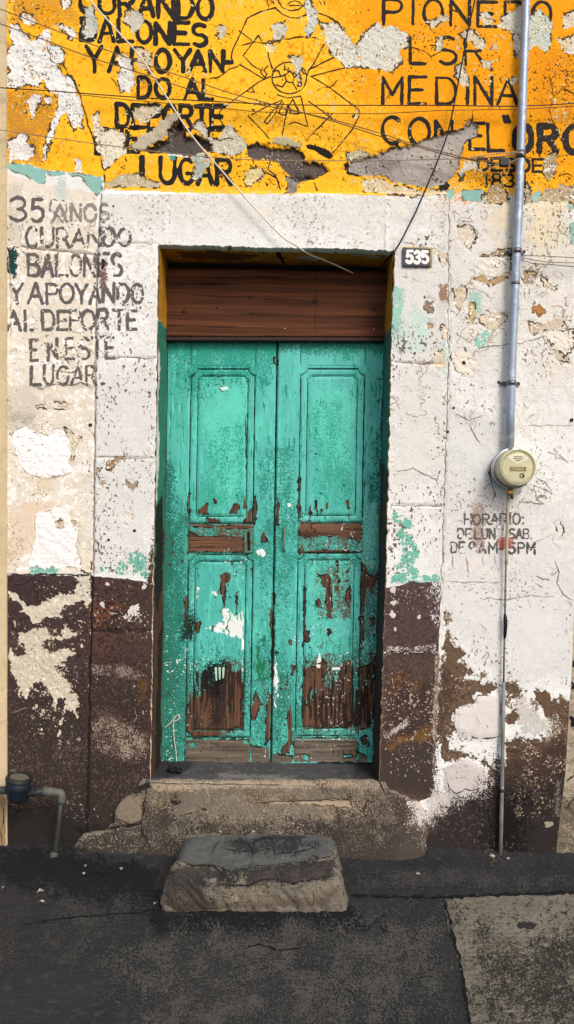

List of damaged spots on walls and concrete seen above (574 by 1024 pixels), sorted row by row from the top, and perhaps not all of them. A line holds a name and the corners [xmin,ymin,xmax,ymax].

peeling [7,0,328,214]
peeling [304,0,410,74]
peeling [427,14,450,51]
peeling [453,62,469,88]
peeling [458,4,574,71]
spalling [345,120,574,439]
crack [363,201,571,794]
peeling [7,508,104,751]
peeling [183,476,381,763]
spalling [417,611,570,780]